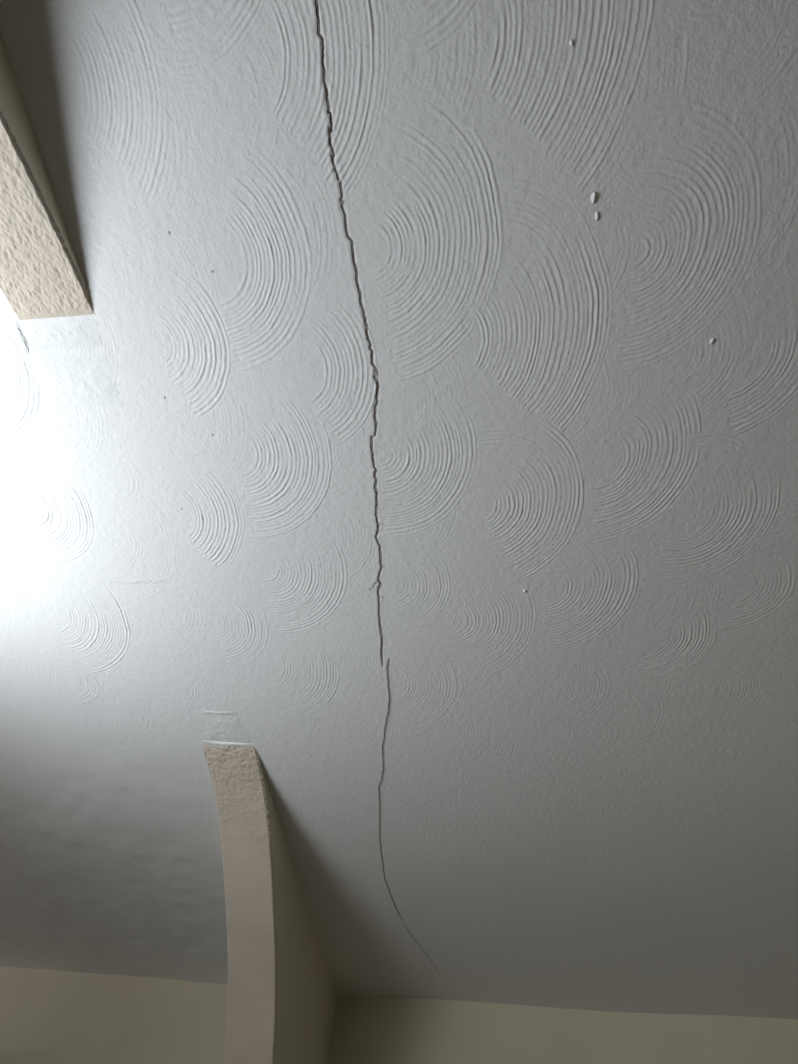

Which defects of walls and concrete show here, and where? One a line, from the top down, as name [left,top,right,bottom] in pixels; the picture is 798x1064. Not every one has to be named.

crack [315,0,439,973]